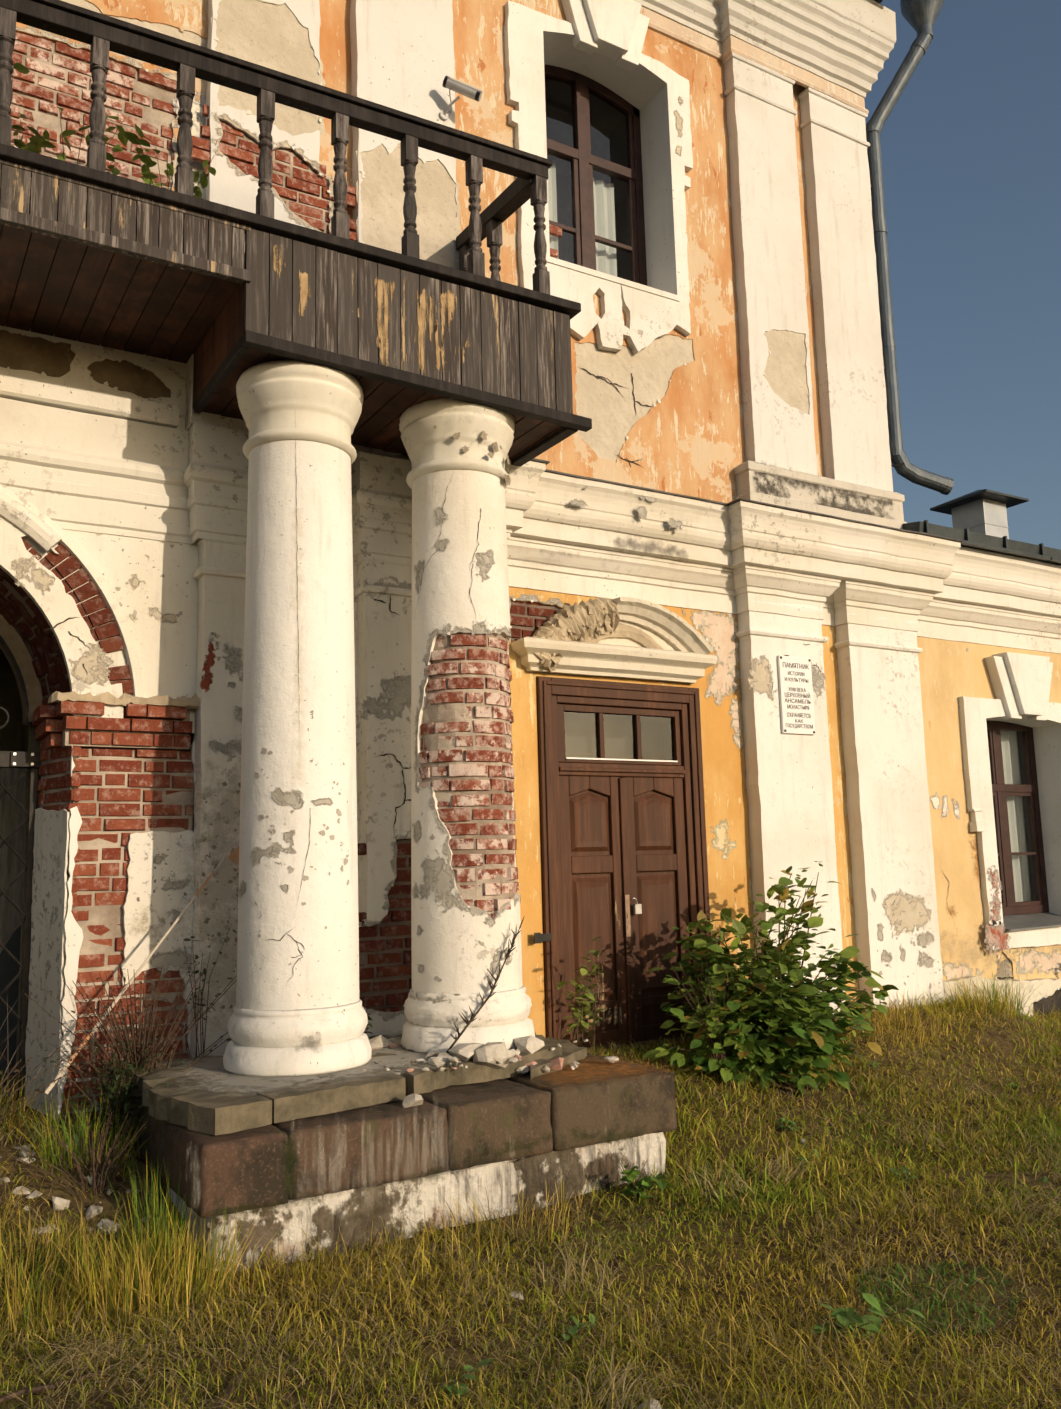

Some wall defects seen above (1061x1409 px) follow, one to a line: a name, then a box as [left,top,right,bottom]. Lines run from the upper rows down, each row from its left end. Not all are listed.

flaking render [61,0,326,86]
flaking render [10,25,461,270]
flaking render [0,330,171,399]
crack [577,366,652,411]
flaking render [575,335,694,462]
flaking render [11,535,188,724]
crack [374,474,453,615]
crack [469,514,481,617]
flaking render [682,608,777,748]
crack [269,816,311,981]
flaking render [64,594,563,1127]
crack [997,952,1061,1004]